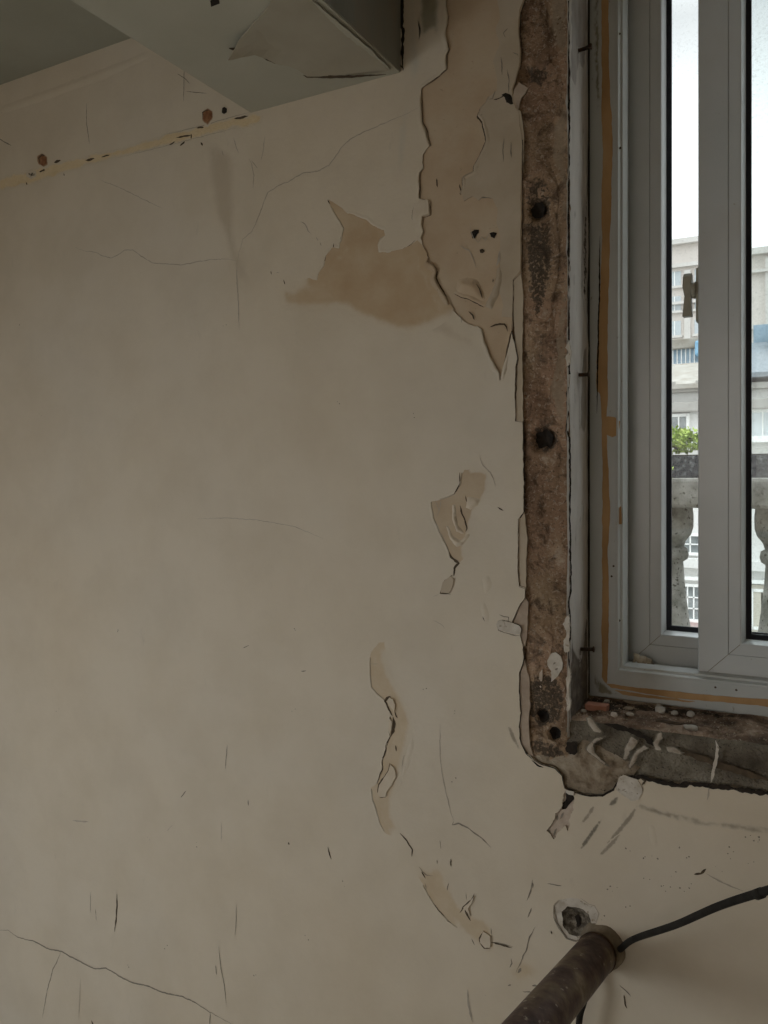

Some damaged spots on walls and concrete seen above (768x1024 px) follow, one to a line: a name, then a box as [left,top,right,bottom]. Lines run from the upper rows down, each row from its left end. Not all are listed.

damp [271,200,454,336]
peeling [407,0,640,838]
crack [5,930,231,1024]
peeling [367,642,548,992]